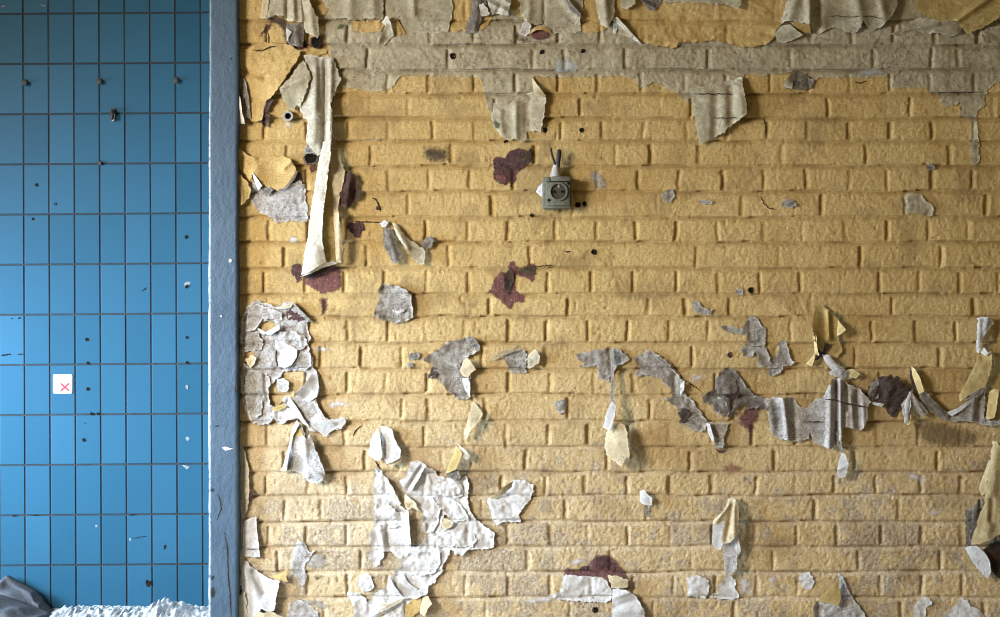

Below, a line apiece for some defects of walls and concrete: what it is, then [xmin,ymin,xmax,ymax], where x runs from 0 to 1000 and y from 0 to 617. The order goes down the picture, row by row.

flaking render [238,0,1000,315]
peeling [235,300,346,484]
peeling [374,284,413,323]
peeling [347,336,540,617]
flaking render [526,555,645,617]
peeling [687,497,749,600]
peeling [576,303,1000,478]
peeling [965,441,1000,579]